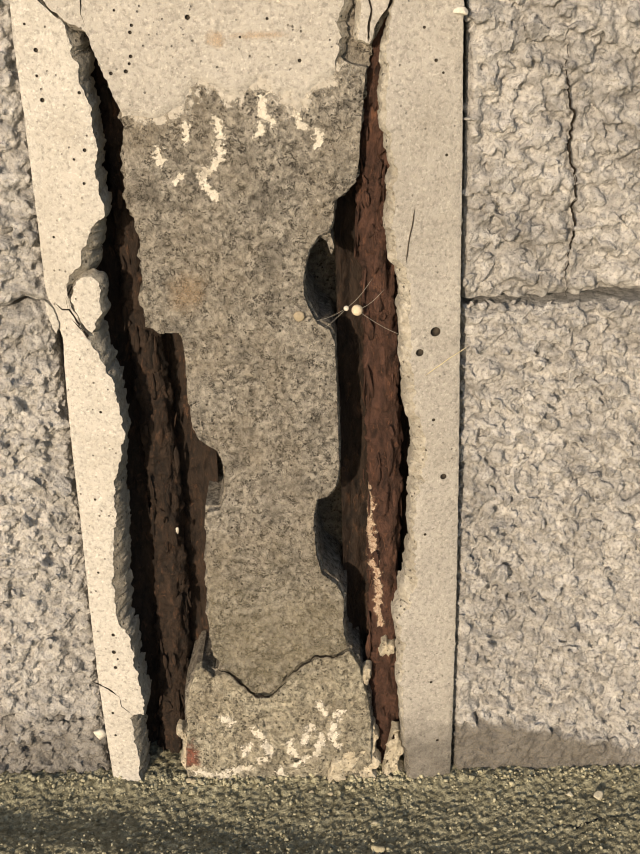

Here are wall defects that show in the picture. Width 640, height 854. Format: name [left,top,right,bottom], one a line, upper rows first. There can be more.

crack [367,0,392,39]
corrosion [367,90,379,111]
corrosion [354,135,386,259]
crack [57,286,89,339]
corrosion [362,255,398,341]
spalling [9,0,161,782]
peeling [120,0,465,782]
corrosion [363,420,404,679]
crack [216,650,349,698]